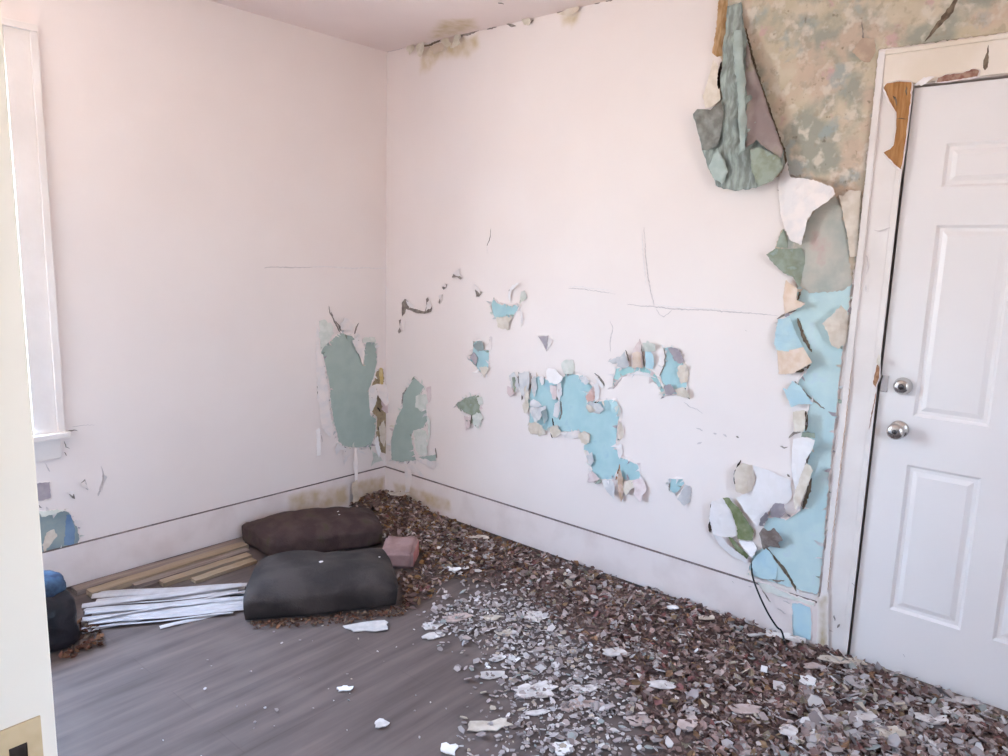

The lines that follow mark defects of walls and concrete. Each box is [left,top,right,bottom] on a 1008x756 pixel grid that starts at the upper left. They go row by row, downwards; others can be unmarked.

leakage [417,16,483,78]
crack [925,0,958,41]
peeling [467,282,527,378]
spalling [538,335,553,351]
peeling [316,307,438,504]
peeling [453,393,484,430]
peeling [507,339,703,506]
crack [569,233,852,591]
peeling [37,479,89,552]
peeling [748,537,815,640]